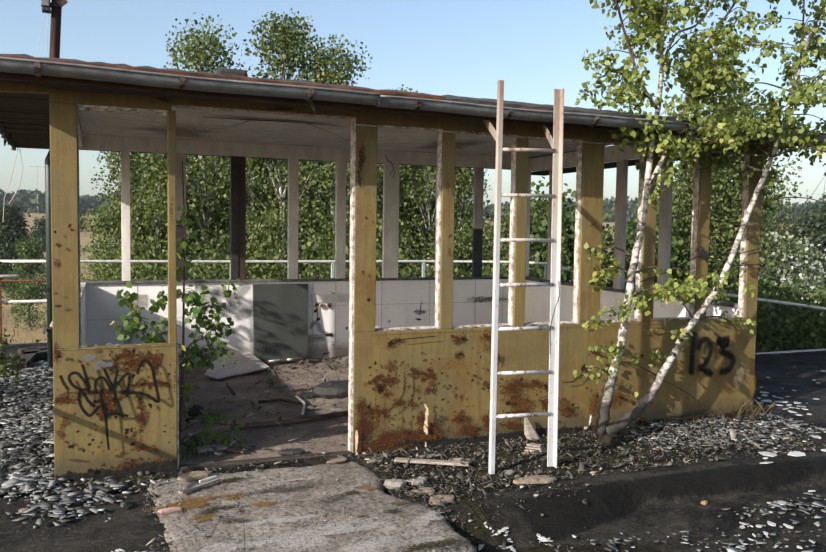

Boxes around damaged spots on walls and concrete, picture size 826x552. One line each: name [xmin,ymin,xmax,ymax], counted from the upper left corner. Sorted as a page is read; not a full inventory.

corrosion [356,147,367,188]
corrosion [54,348,176,471]
corrosion [231,328,549,454]
corrosion [558,387,600,423]